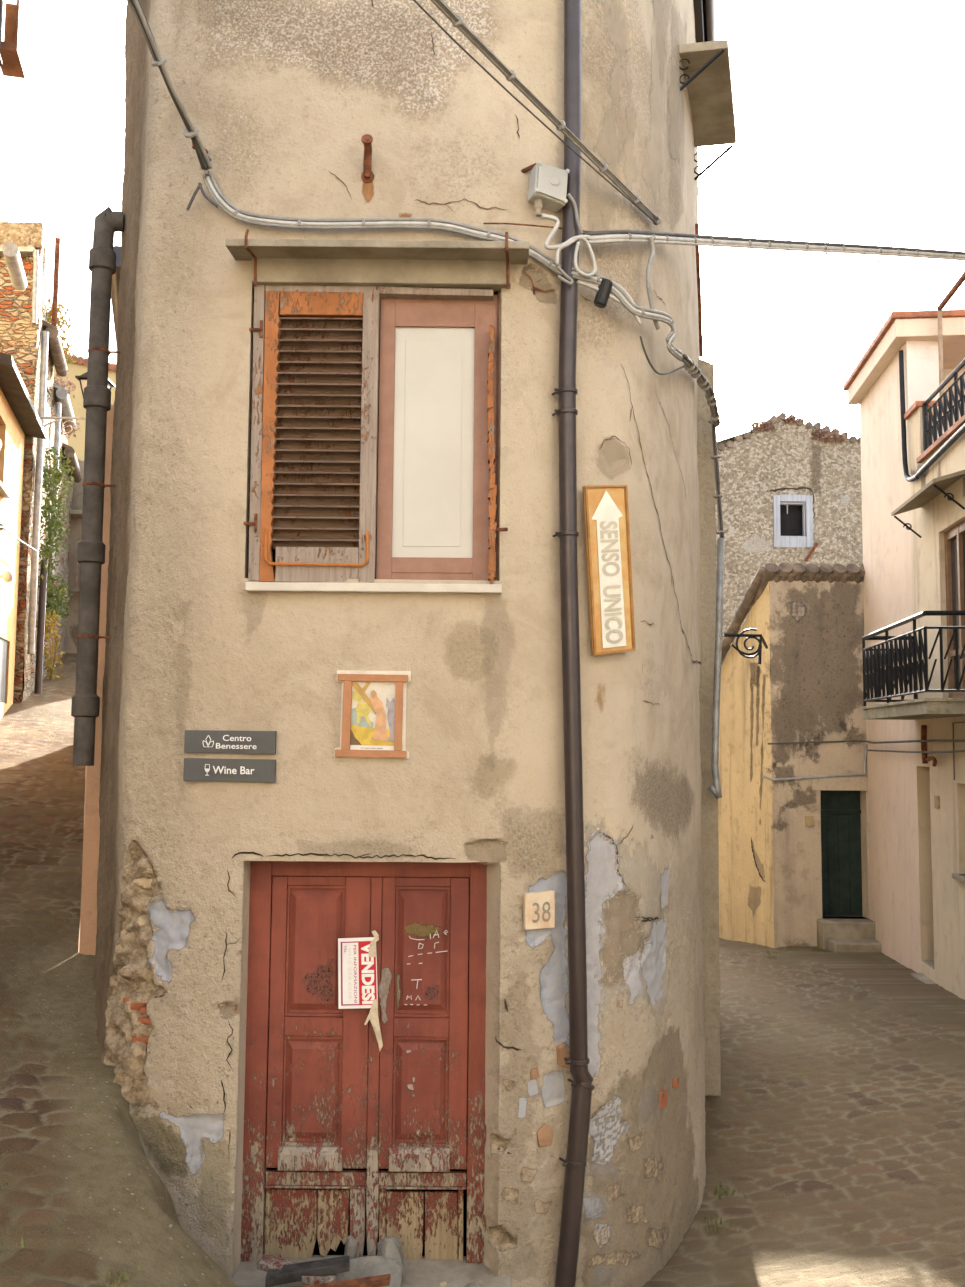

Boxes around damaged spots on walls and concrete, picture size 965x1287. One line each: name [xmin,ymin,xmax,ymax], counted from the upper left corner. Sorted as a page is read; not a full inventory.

spalling [103,841,224,1174]
peeling [518,871,570,1119]
peeling [585,830,670,1077]
flaking render [536,1124,553,1147]